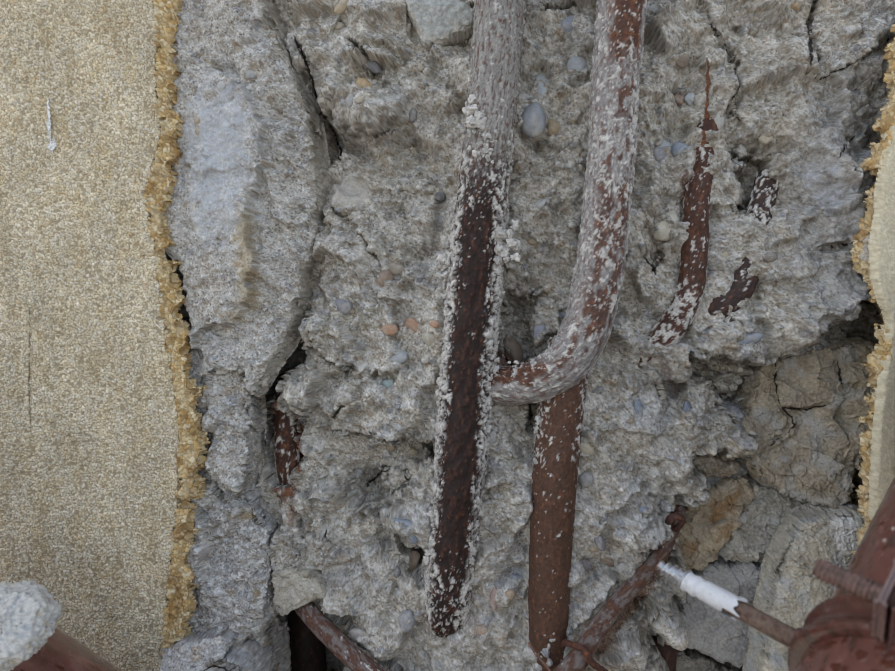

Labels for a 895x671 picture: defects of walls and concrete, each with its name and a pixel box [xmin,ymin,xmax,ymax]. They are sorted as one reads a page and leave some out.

crack [293,35,342,161]
crack [808,29,849,80]
spalling [496,0,597,367]
spalling [144,0,211,663]
spalling [255,0,555,671]
rust [497,350,528,366]
spalling [563,0,895,671]
crack [770,363,826,446]
rust [273,482,295,502]
rust [595,543,671,659]